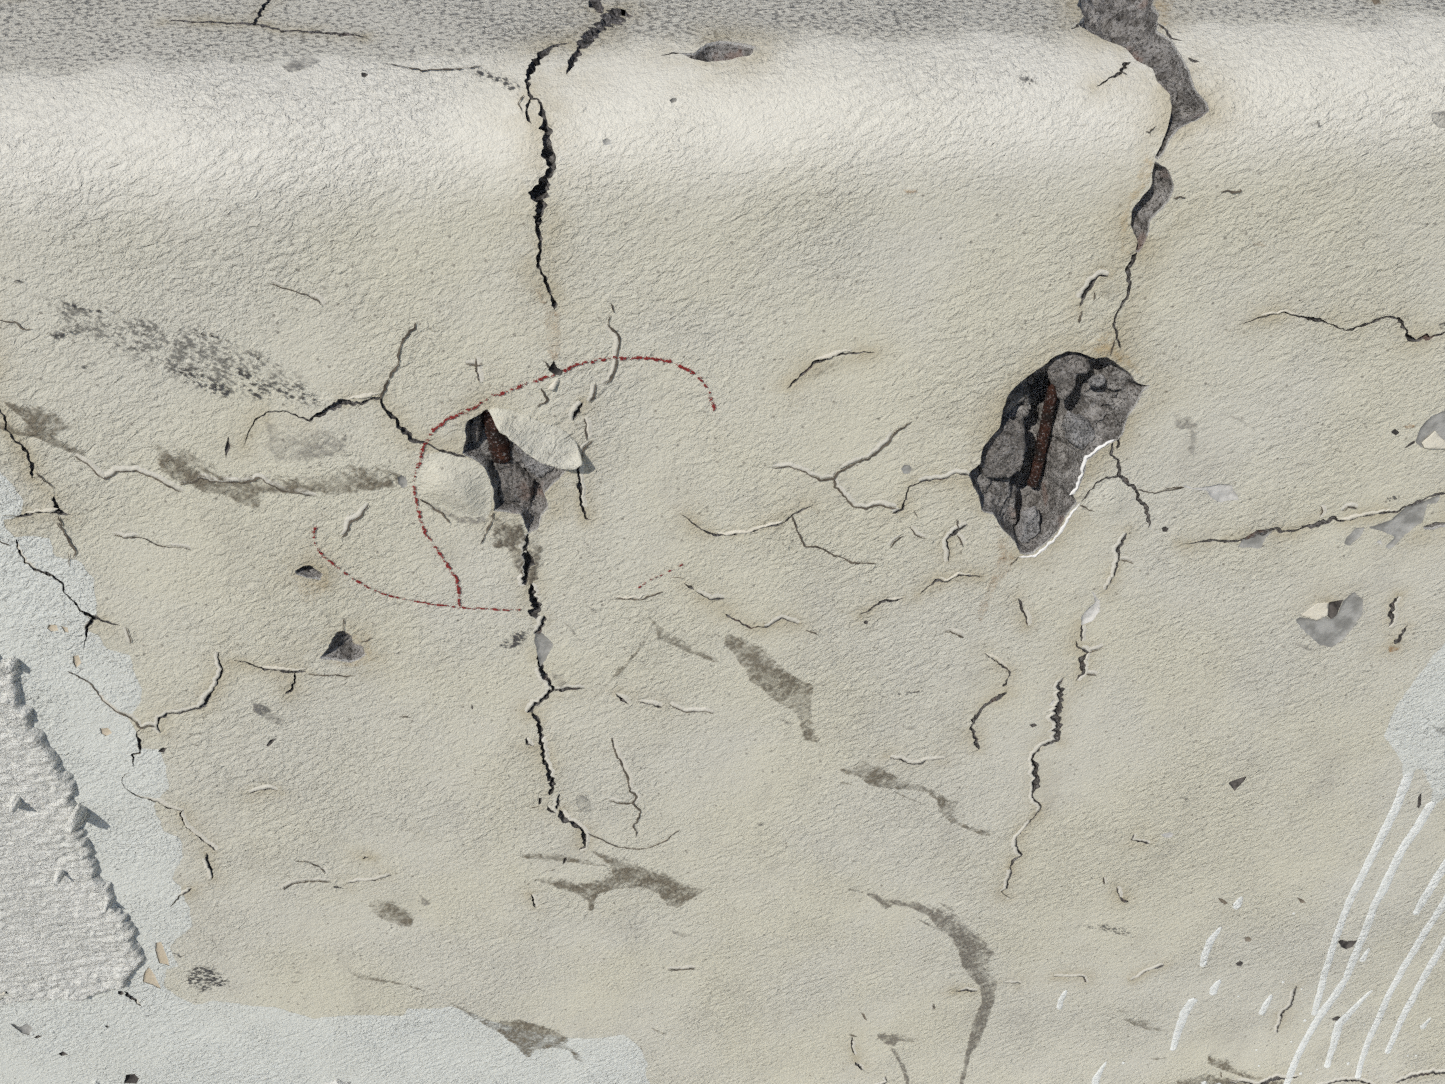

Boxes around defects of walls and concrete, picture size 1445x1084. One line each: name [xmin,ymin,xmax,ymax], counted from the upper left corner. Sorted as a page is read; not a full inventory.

crack [517,0,633,310]
spalling [1071,0,1209,253]
crack [74,323,466,497]
spalling [462,361,583,544]
spalling [968,351,1184,565]
crack [1076,253,1137,356]
crack [1243,309,1445,342]
peeling [1344,495,1445,549]
crack [0,409,349,906]
peeling [1296,592,1363,647]
crack [1000,625,1103,899]
peeling [124,1074,139,1083]